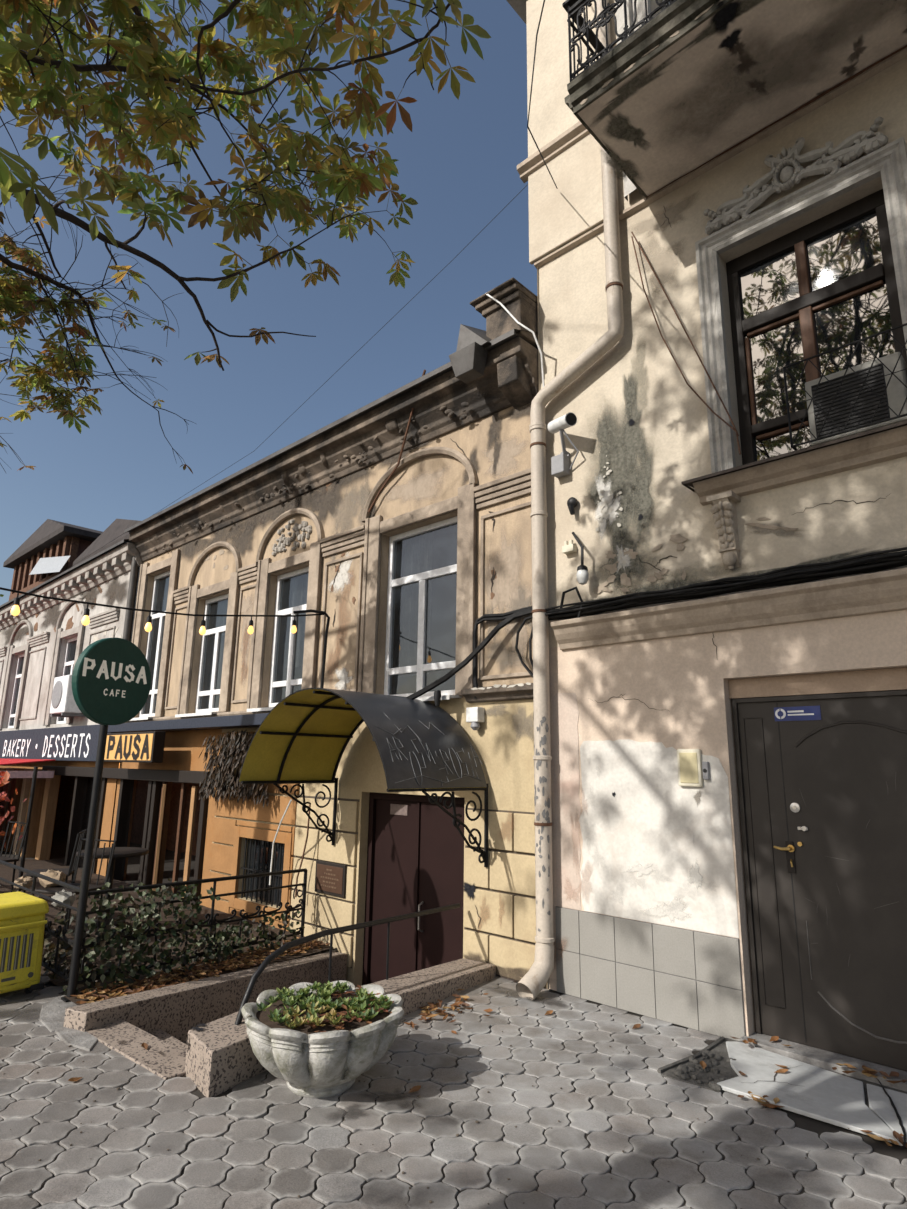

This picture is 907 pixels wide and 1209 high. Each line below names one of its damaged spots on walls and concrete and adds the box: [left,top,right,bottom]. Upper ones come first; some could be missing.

water stain [679,0,765,92]
water stain [596,62,668,181]
peeling [596,455,623,532]
crack [795,494,890,514]
flaking render [592,534,688,594]
crack [876,1078,906,1147]